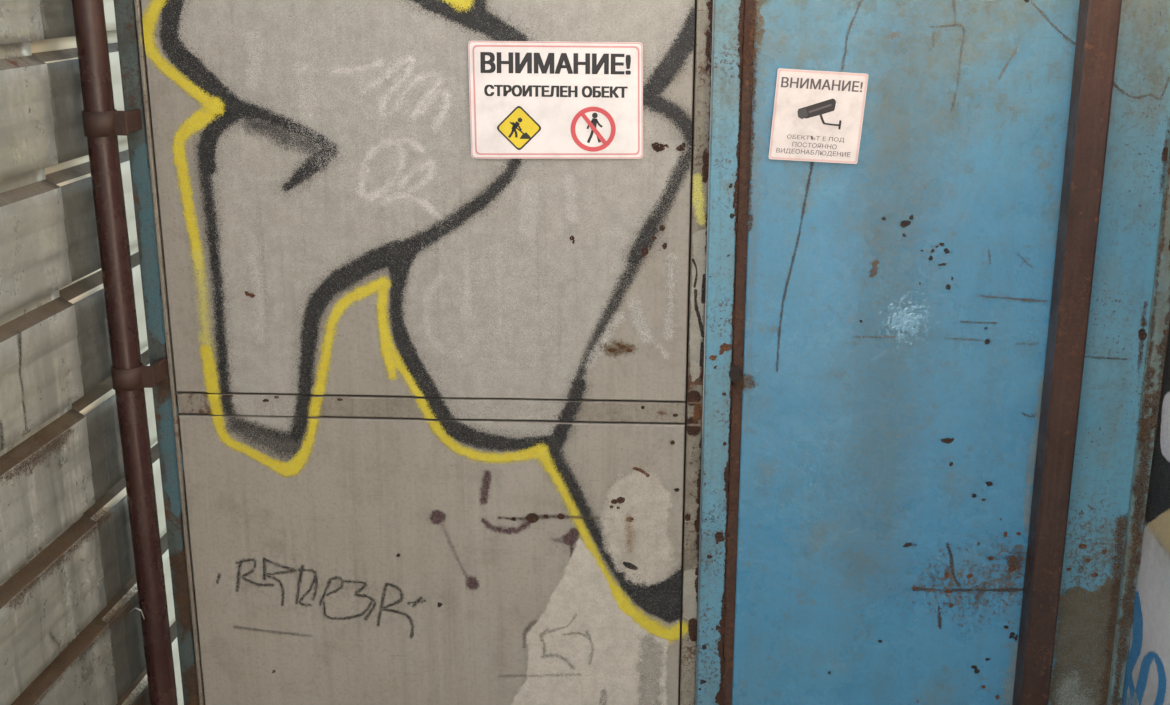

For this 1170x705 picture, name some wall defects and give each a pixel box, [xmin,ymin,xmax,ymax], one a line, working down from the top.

rust [705,0,713,107]
rust [730,0,768,367]
peeling [511,462,698,705]
rust [673,370,703,601]
rust [688,618,697,641]
peeling [705,518,725,559]
rust [715,381,733,705]
rust [888,518,1029,634]
rust [1059,117,1170,705]